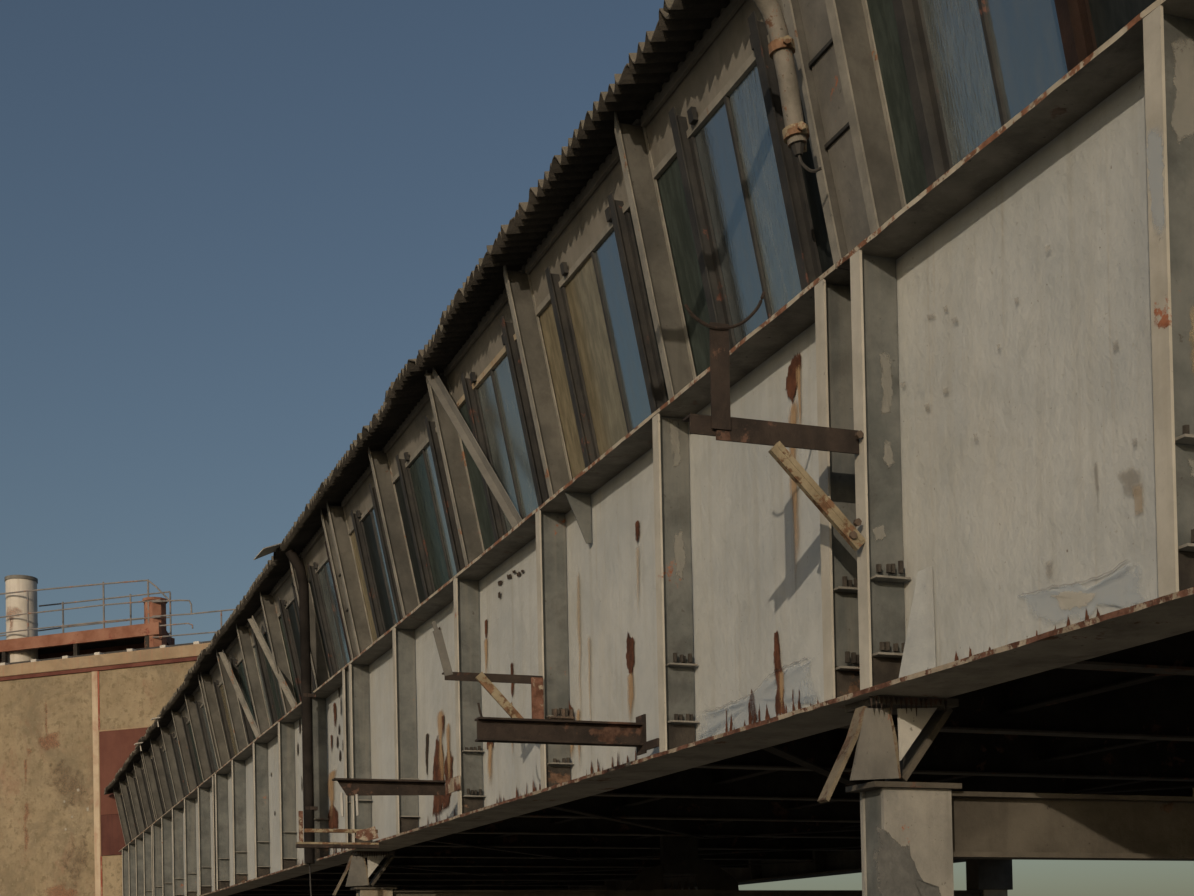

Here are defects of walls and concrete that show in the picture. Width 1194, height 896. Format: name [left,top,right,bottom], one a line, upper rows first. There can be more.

corrosion [786,353,801,424]
corrosion [626,633,634,714]
corrosion [725,631,819,732]
peeling [873,827,941,896]